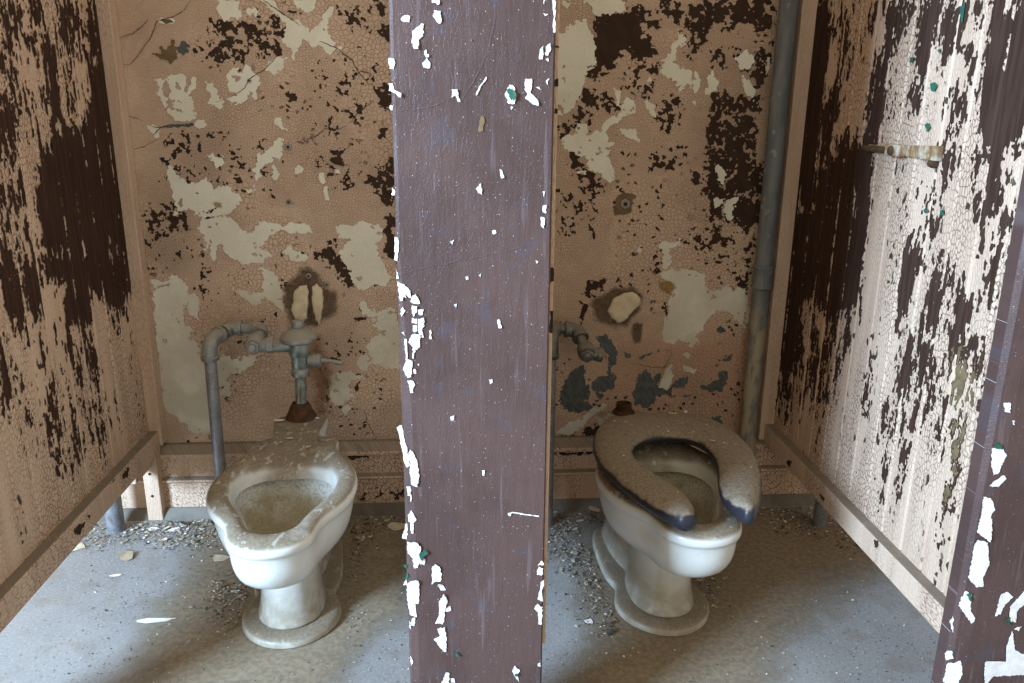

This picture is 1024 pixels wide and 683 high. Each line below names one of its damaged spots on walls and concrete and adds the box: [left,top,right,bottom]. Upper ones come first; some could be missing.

peeling [0,0,133,484]
crack [122,0,191,65]
crack [129,116,184,150]
flaking render [142,0,432,435]
water stain [283,268,336,325]
crack [301,41,375,144]
peeling [401,0,442,69]
peeling [505,0,777,436]
peeling [775,0,1024,549]
peeling [349,425,459,657]
peeling [534,561,544,625]
peeling [949,442,1007,630]